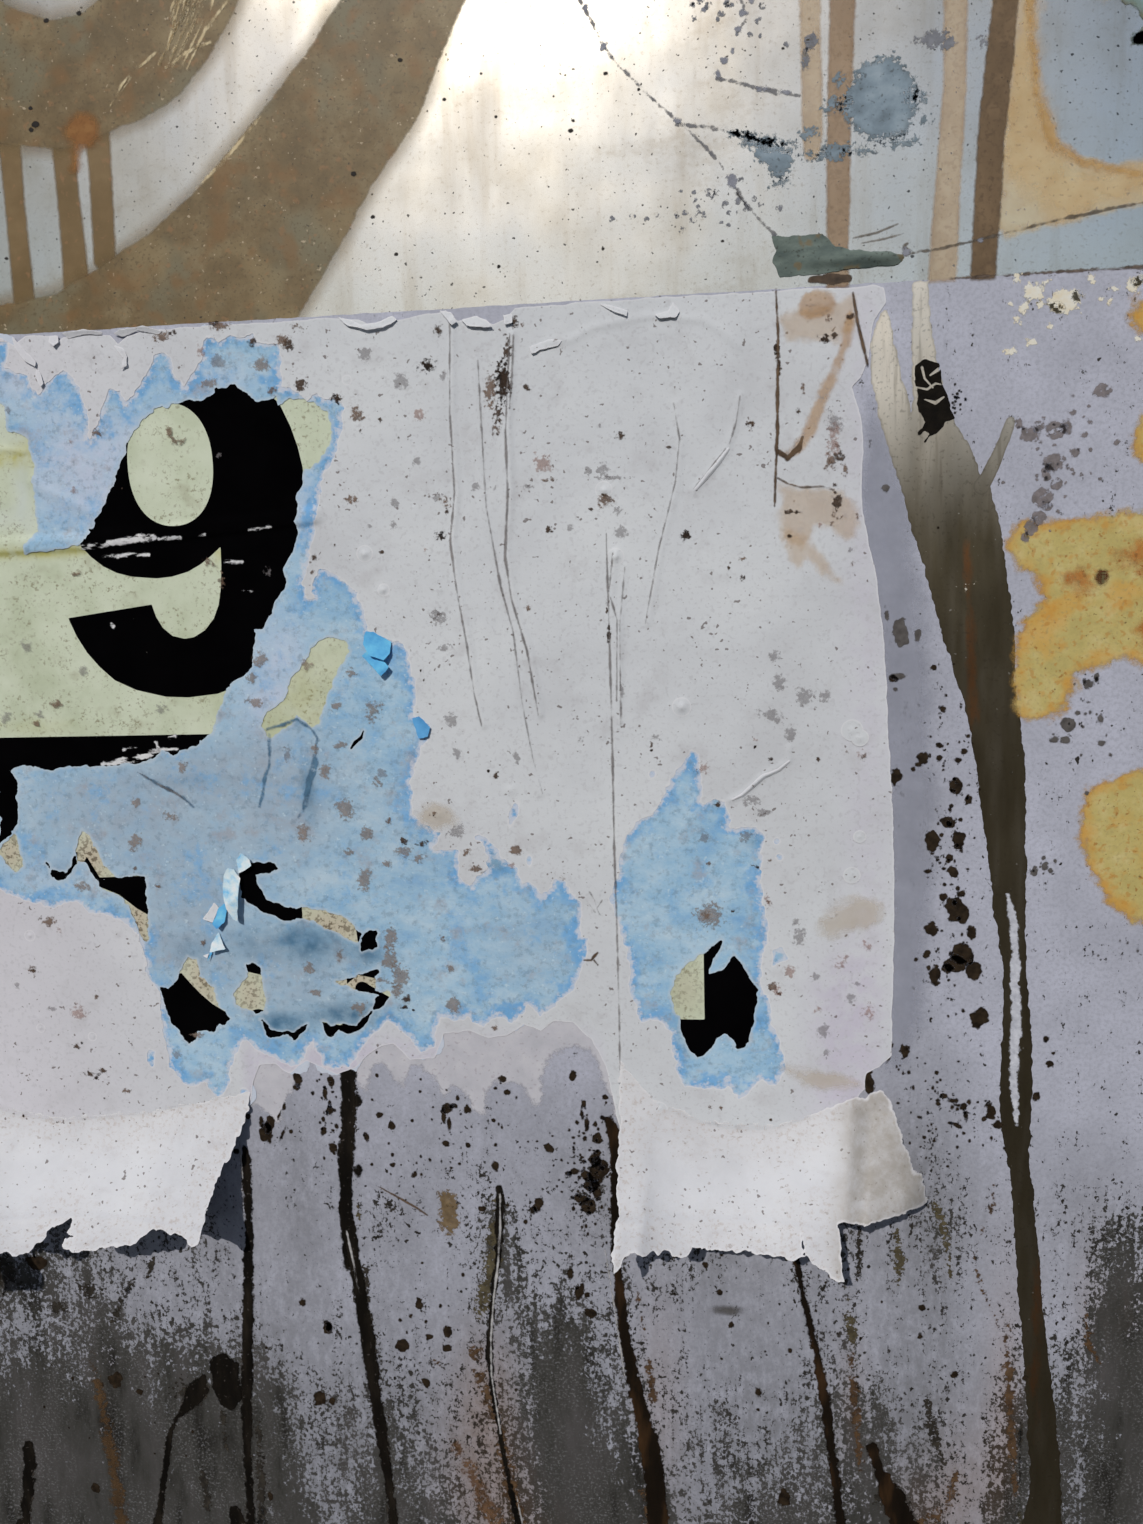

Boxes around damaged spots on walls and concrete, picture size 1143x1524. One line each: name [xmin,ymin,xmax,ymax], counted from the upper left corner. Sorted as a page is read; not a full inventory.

peeling [609,50,933,232]
peeling [772,234,904,285]
rust [1128,301,1143,332]
rust [1133,415,1143,462]
rust [1005,510,1143,719]
peeling [870,281,1113,1524]
rust [1080,769,1143,924]
peeling [370,1075,517,1175]
leakage [153,1146,256,1524]
leakage [337,1069,398,1524]
leakage [600,1115,670,1524]
leakage [793,1258,846,1524]